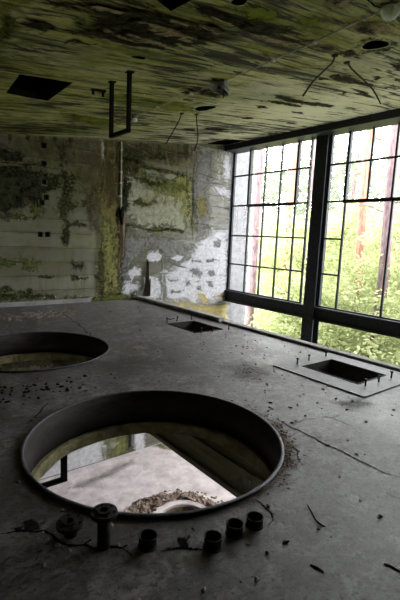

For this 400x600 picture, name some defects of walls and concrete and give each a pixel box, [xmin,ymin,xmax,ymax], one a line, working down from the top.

leakage [177,86,222,100]
leakage [255,95,335,114]
leakage [319,74,383,98]
leakage [0,134,61,222]
leakage [26,135,225,301]
peeling [122,151,253,324]
crack [271,415,398,477]
crack [1,529,132,556]